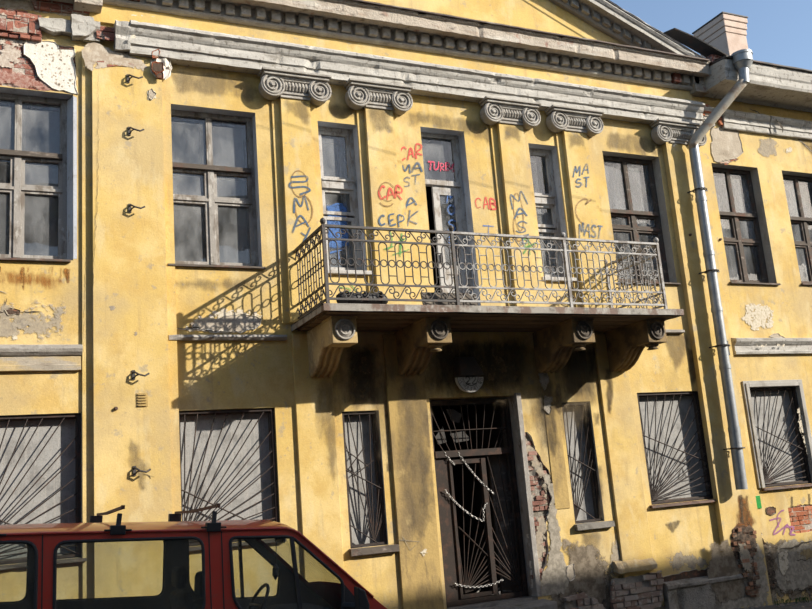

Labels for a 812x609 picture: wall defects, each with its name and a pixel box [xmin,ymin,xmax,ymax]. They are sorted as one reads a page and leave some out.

flaking render [0,0,147,94]
spalling [703,104,743,166]
peeling [758,138,792,157]
rust [8,267,69,289]
peeling [0,301,66,340]
peeling [742,303,785,347]
water stain [350,348,375,403]
water stain [437,342,522,387]
flaking render [525,432,552,582]
flaking render [788,504,812,533]
flaking render [730,522,774,597]
peeling [778,548,812,576]